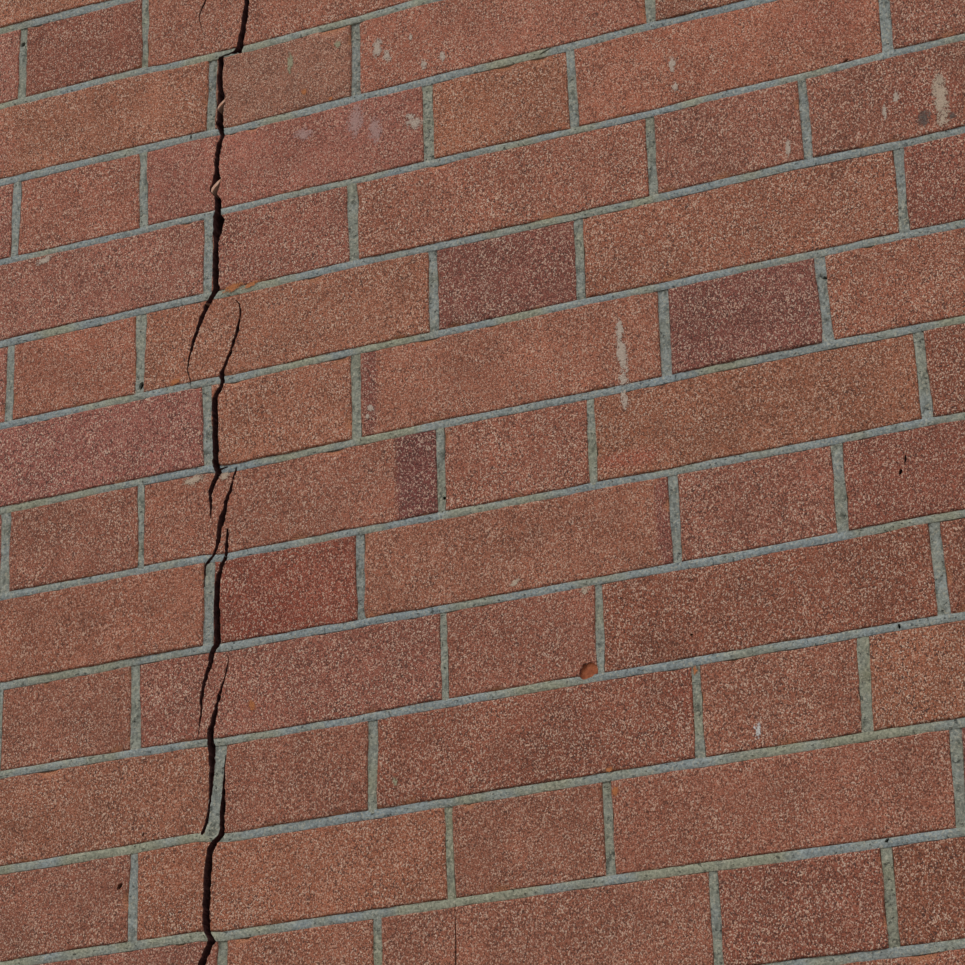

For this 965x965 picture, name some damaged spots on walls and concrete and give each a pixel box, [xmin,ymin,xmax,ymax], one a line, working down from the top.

crack [187,0,250,965]